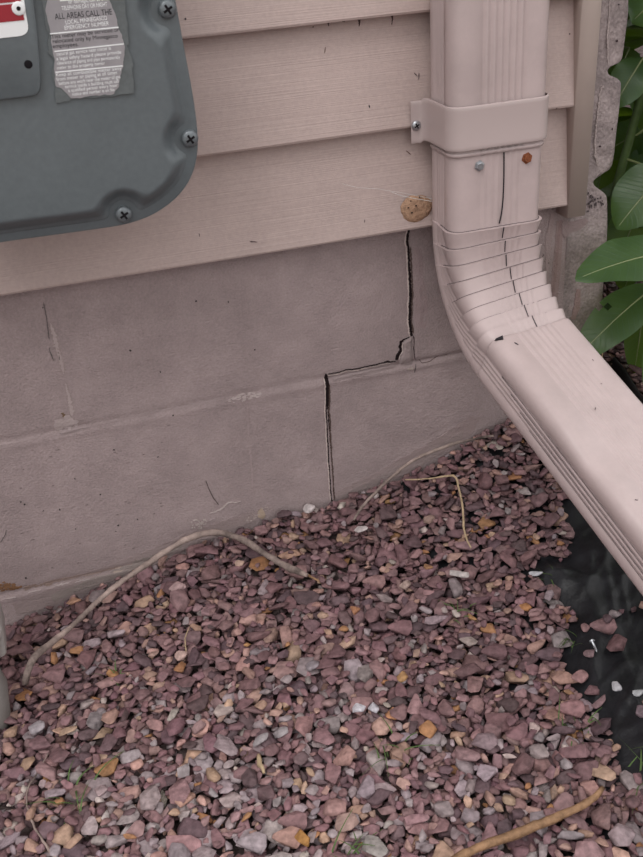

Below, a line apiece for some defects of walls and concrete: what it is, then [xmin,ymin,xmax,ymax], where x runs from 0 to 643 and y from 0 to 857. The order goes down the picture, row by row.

crack [324,230,447,501]